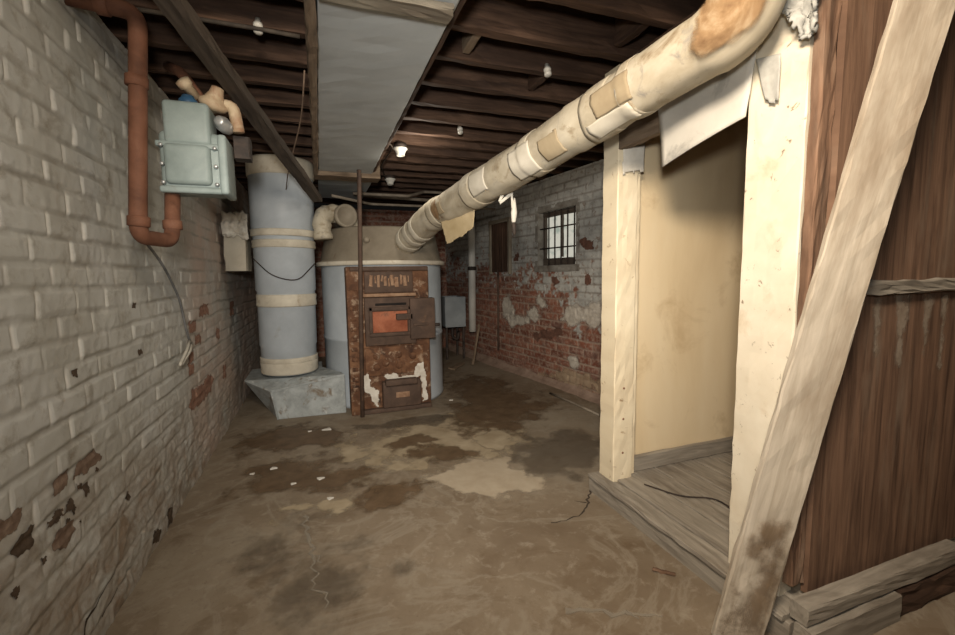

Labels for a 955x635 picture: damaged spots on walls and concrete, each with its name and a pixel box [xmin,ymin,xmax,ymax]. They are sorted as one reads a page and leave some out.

spalling [579,237,594,250]
water stain [232,375,555,514]
peeling [0,508,34,558]
peeling [41,448,102,565]
spalling [153,507,173,544]